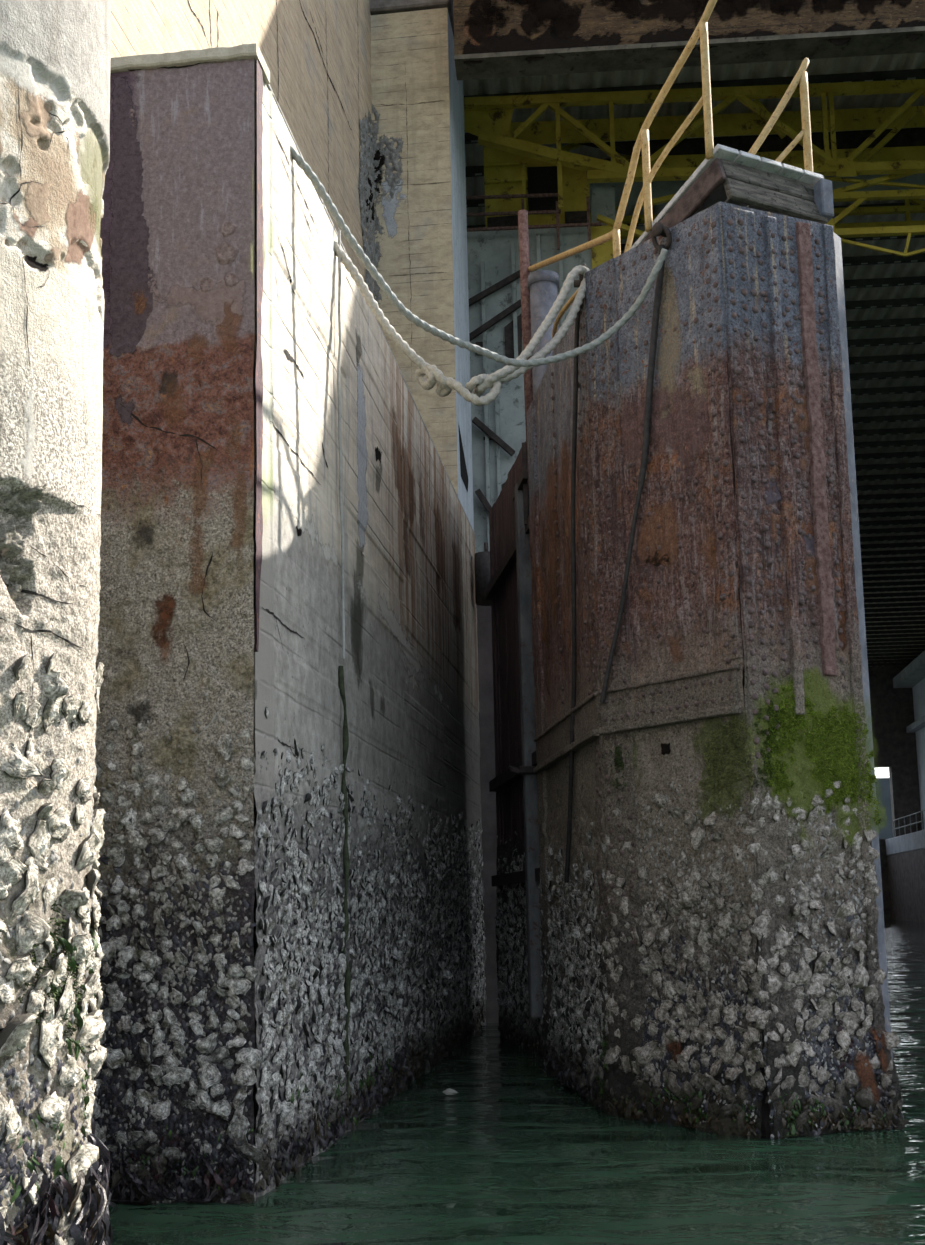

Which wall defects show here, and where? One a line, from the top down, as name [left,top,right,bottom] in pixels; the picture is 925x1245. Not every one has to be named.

flaking render [13,182,50,240]
peeling [20,77,165,357]
spalling [358,105,404,305]
rust [217,302,241,350]
crack [0,547,89,694]
rust [152,595,176,660]
rust [854,1029,888,1102]